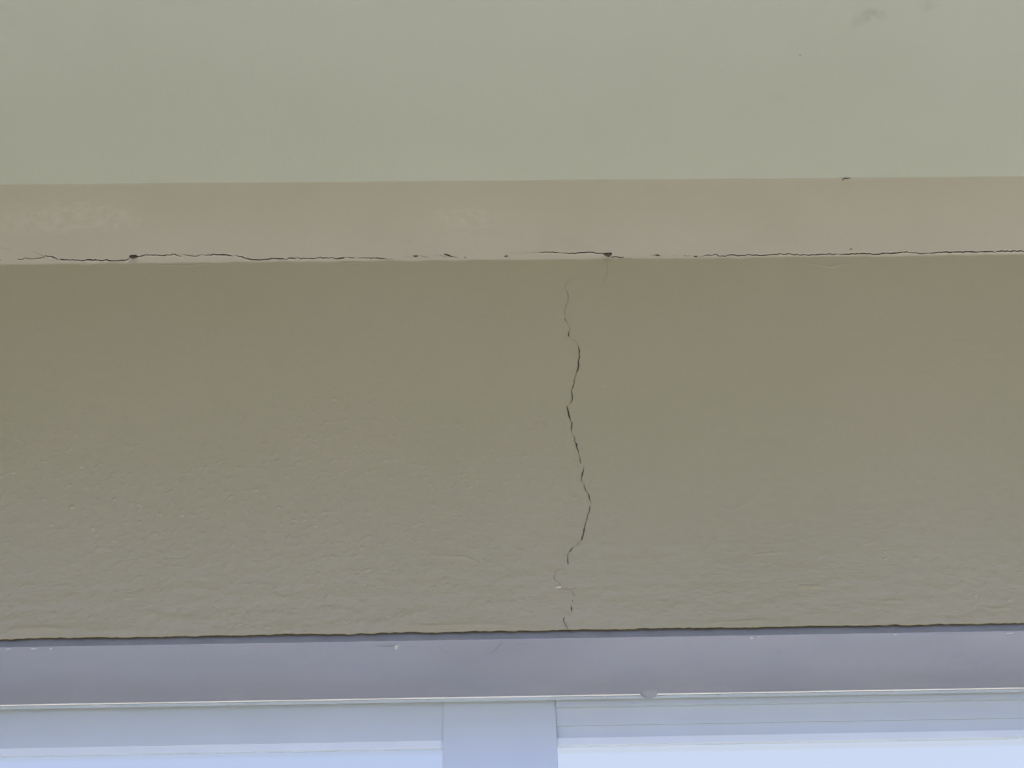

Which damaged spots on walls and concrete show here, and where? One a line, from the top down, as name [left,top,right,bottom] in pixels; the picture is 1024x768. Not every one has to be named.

crack [0,253,466,263]
crack [538,250,623,258]
crack [656,249,1024,258]
crack [565,319,590,562]